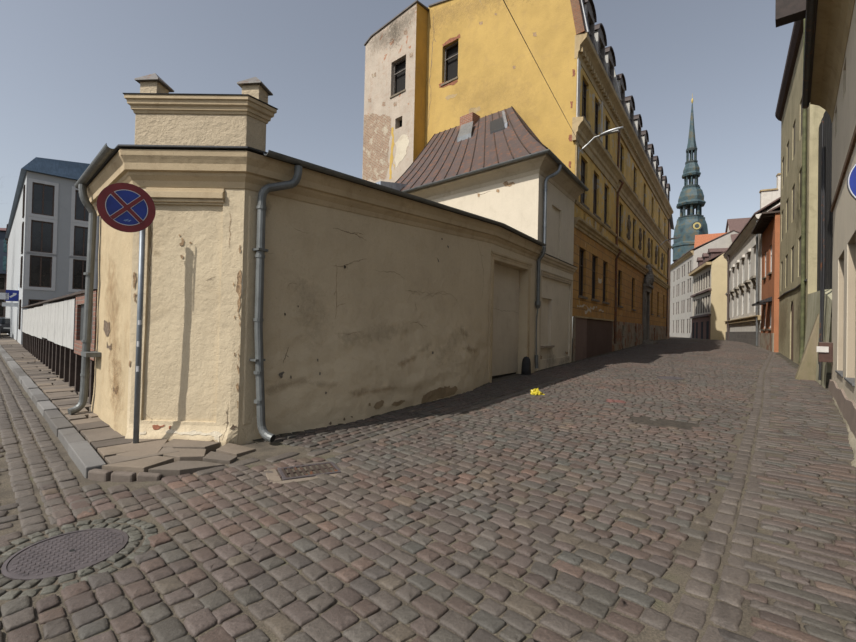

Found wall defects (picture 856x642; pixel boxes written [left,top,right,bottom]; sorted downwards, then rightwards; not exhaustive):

peeling [363,102,409,181]
spalling [421,386,458,403]
peeling [139,412,237,442]